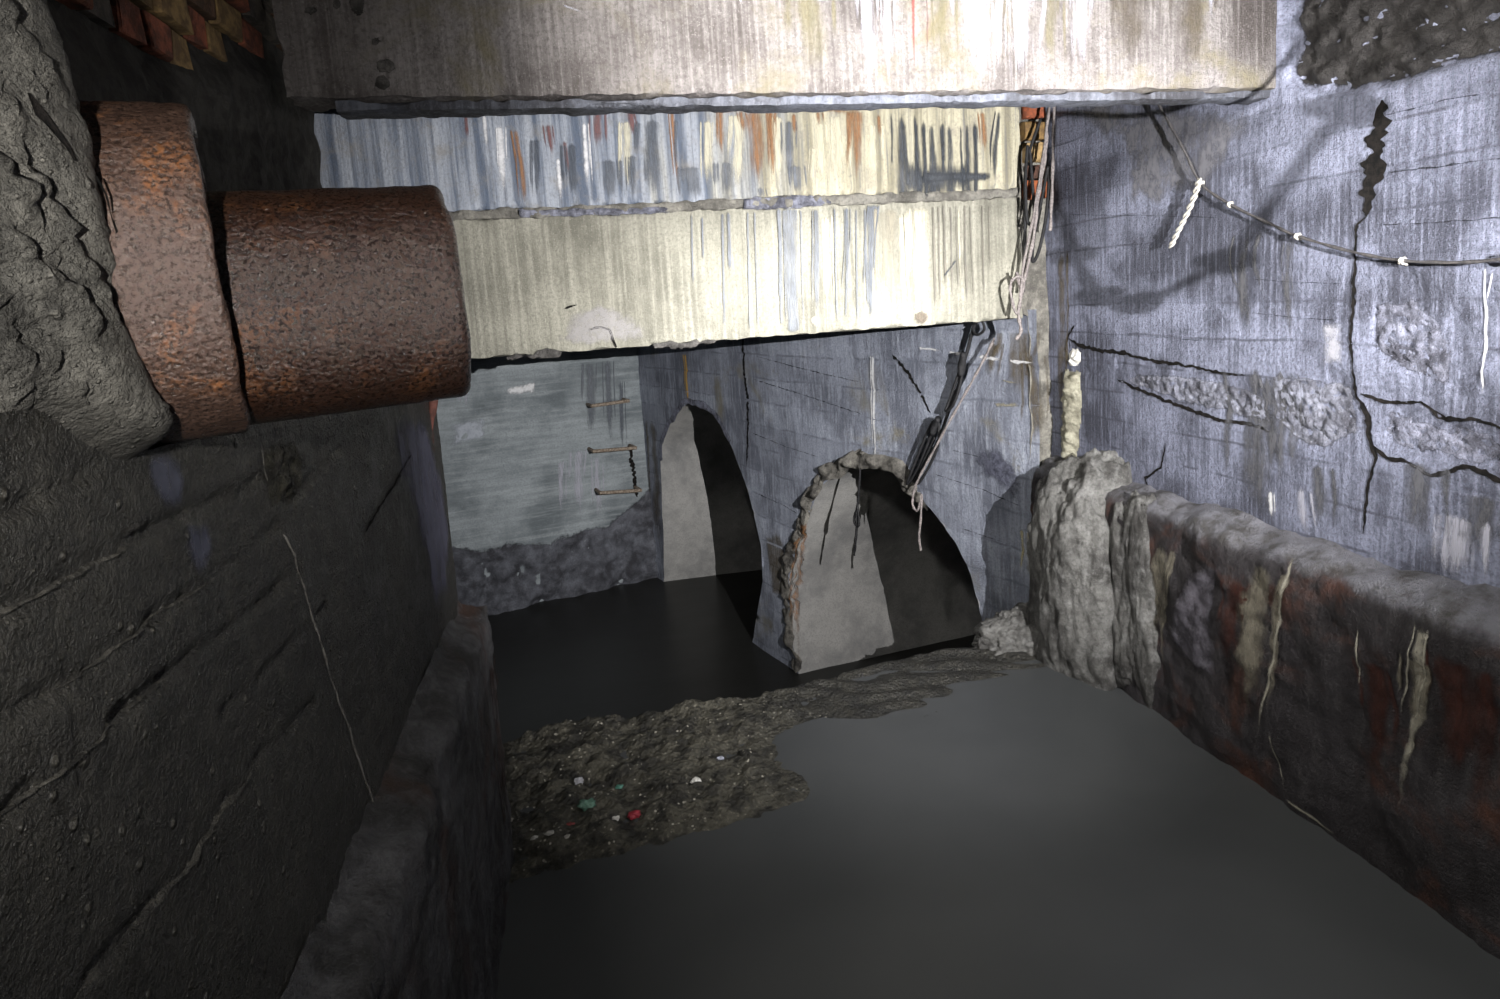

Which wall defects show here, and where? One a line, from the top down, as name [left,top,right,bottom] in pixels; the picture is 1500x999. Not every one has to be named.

spalling [1297,0,1500,89]
damp [483,117,507,181]
damp [530,140,539,186]
damp [557,116,743,195]
damp [772,112,1000,331]
damp [721,213,759,325]
crack [1065,326,1269,432]
spalling [1121,374,1357,447]
crack [1256,94,1500,533]
spalling [1375,299,1452,385]
crack [1144,444,1166,485]
spalling [780,449,928,673]